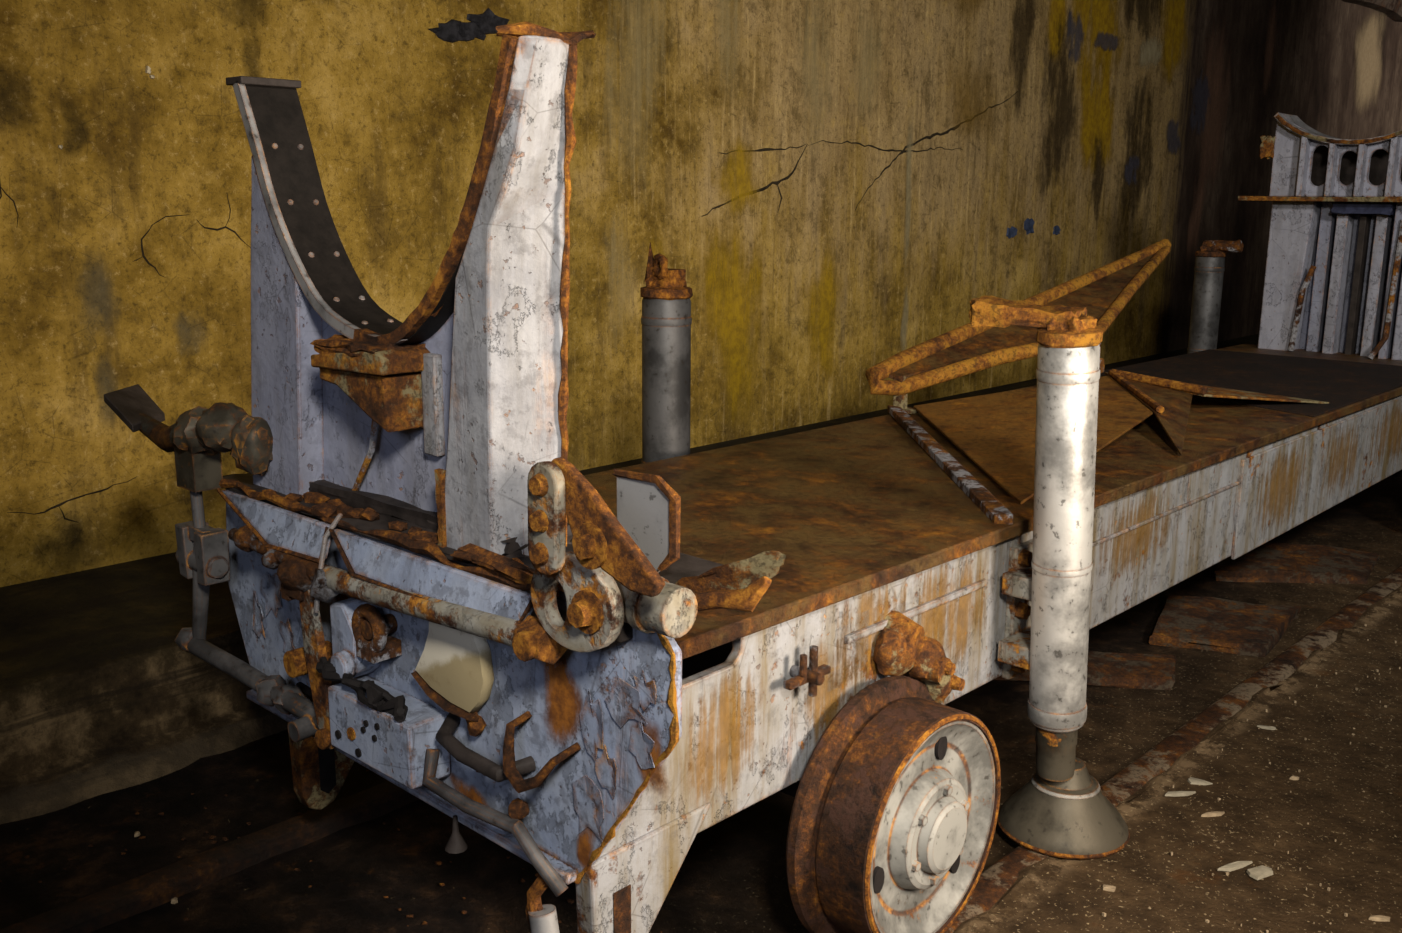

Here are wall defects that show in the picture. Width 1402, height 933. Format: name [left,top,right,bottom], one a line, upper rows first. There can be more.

peeling [428,8,509,43]
damp [1010,0,1035,108]
damp [1125,0,1161,65]
crack [703,92,1017,216]
damp [1040,26,1075,191]
damp [1092,139,1104,220]
damp [1121,83,1152,216]